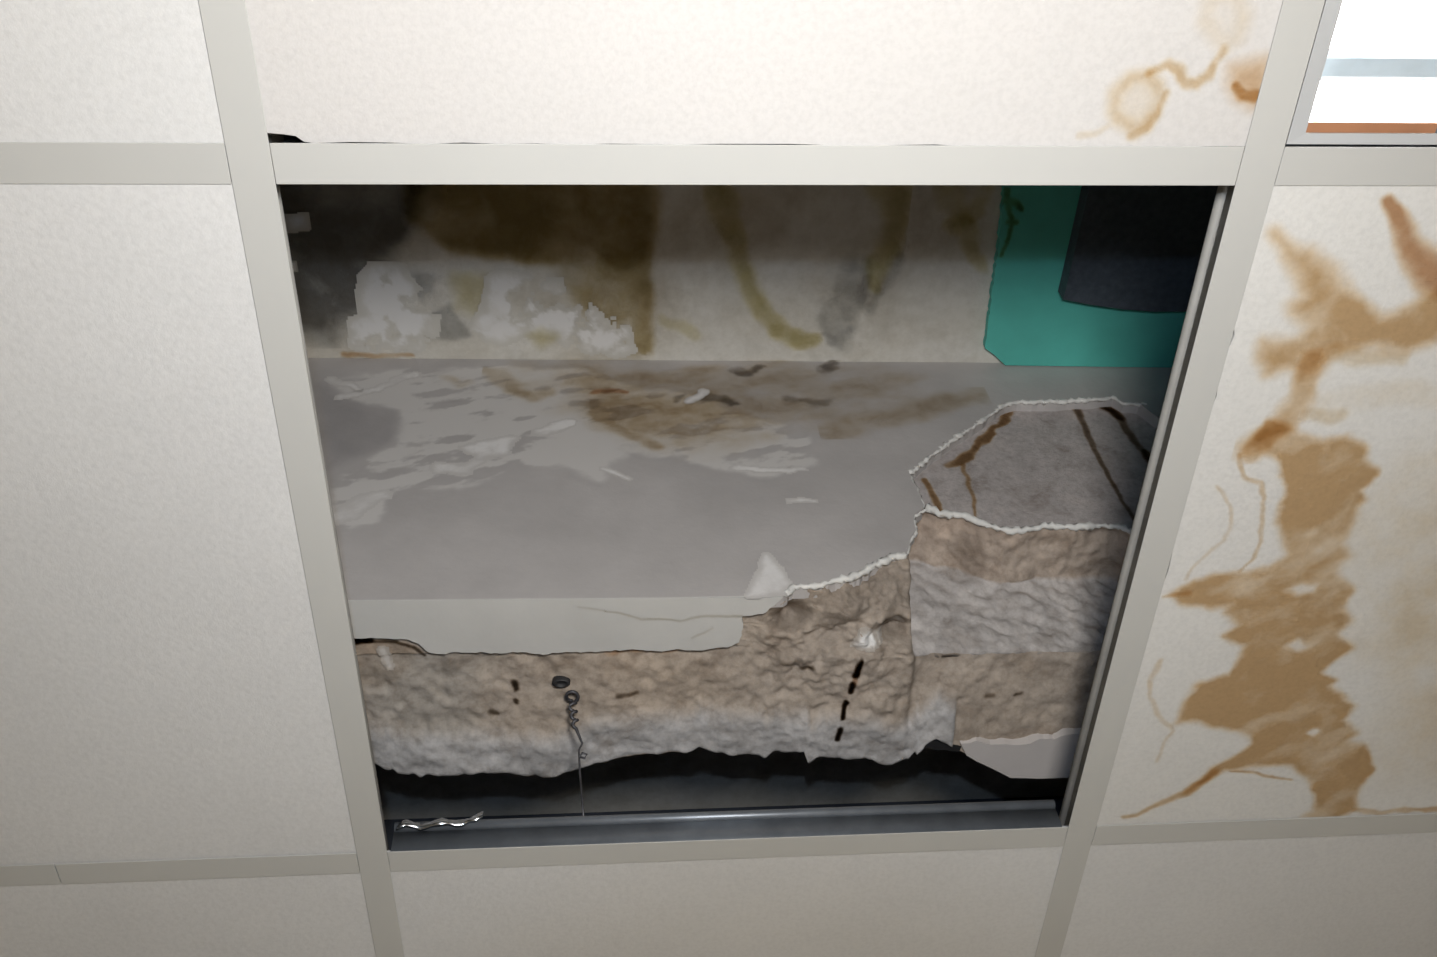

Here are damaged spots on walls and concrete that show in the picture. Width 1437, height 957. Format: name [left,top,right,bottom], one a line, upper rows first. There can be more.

water stain [413,185,558,259]
peeling [279,184,827,536]
spalling [354,395,1157,778]